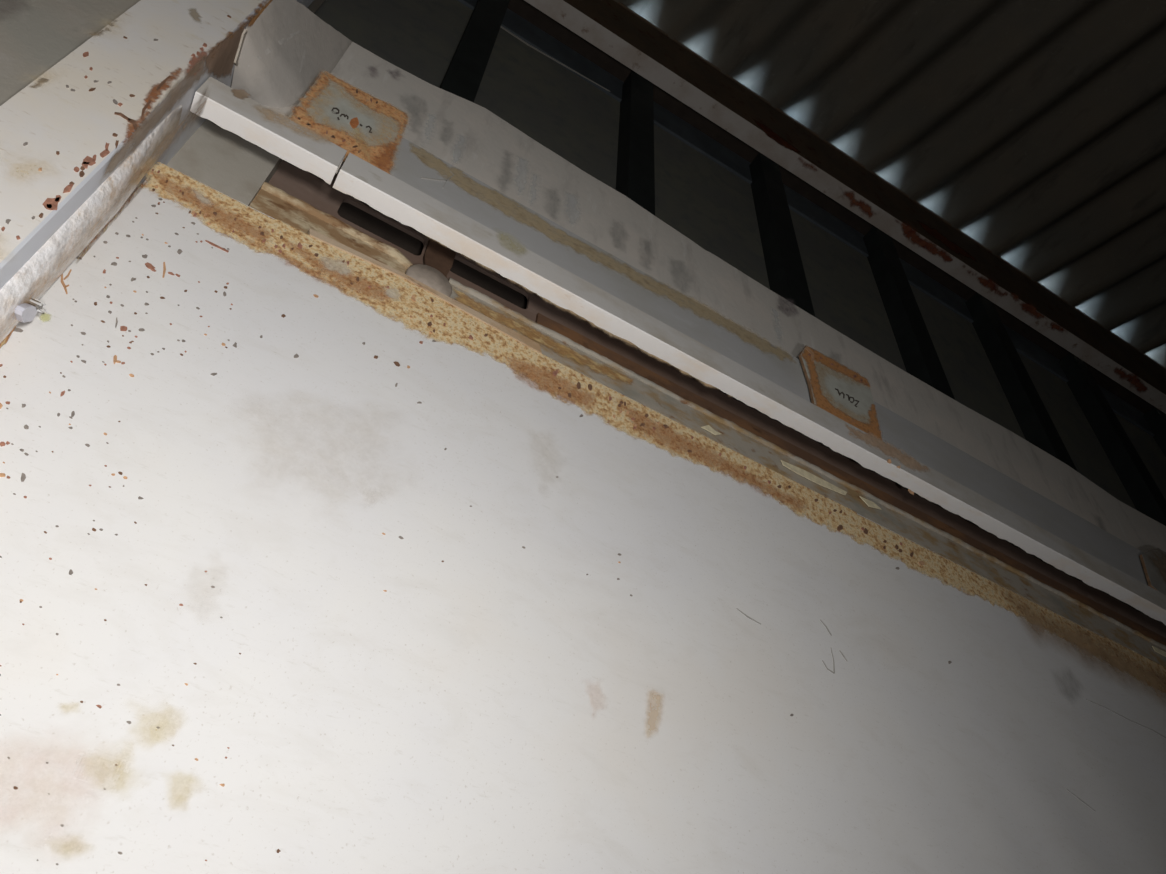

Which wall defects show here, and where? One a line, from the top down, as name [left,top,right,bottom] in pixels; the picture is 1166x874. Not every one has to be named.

corrosion [114,0,273,142]
corrosion [264,71,408,174]
corrosion [61,92,1166,697]
peeling [780,460,882,510]